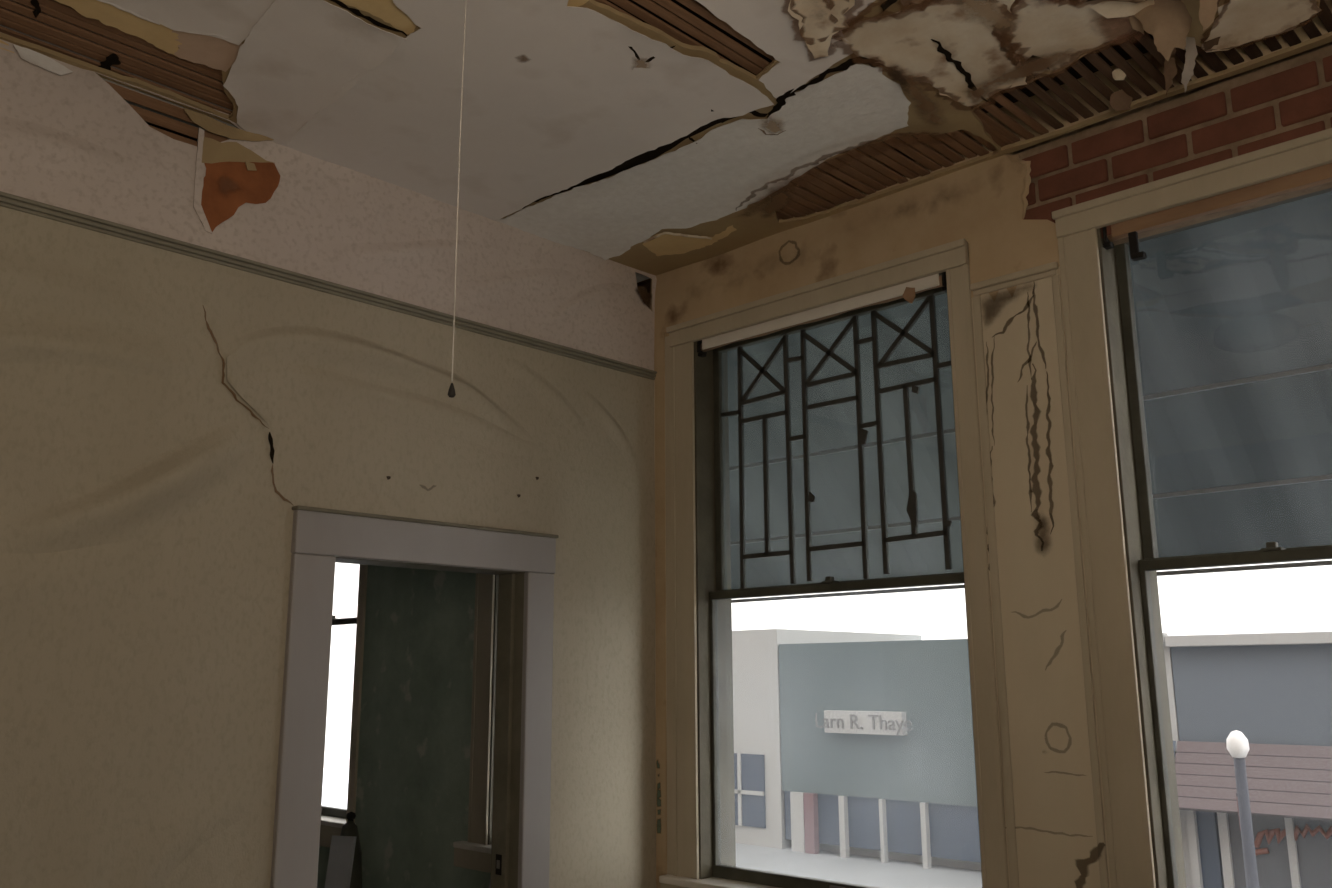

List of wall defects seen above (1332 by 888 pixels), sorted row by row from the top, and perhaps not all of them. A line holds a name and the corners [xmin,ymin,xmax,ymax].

peeling [55,0,242,72]
peeling [330,0,417,36]
crack [628,46,675,62]
water stain [1100,16,1141,42]
water stain [736,66,952,217]
flaking render [1003,0,1332,223]
spalling [193,127,280,234]
peeling [643,225,737,256]